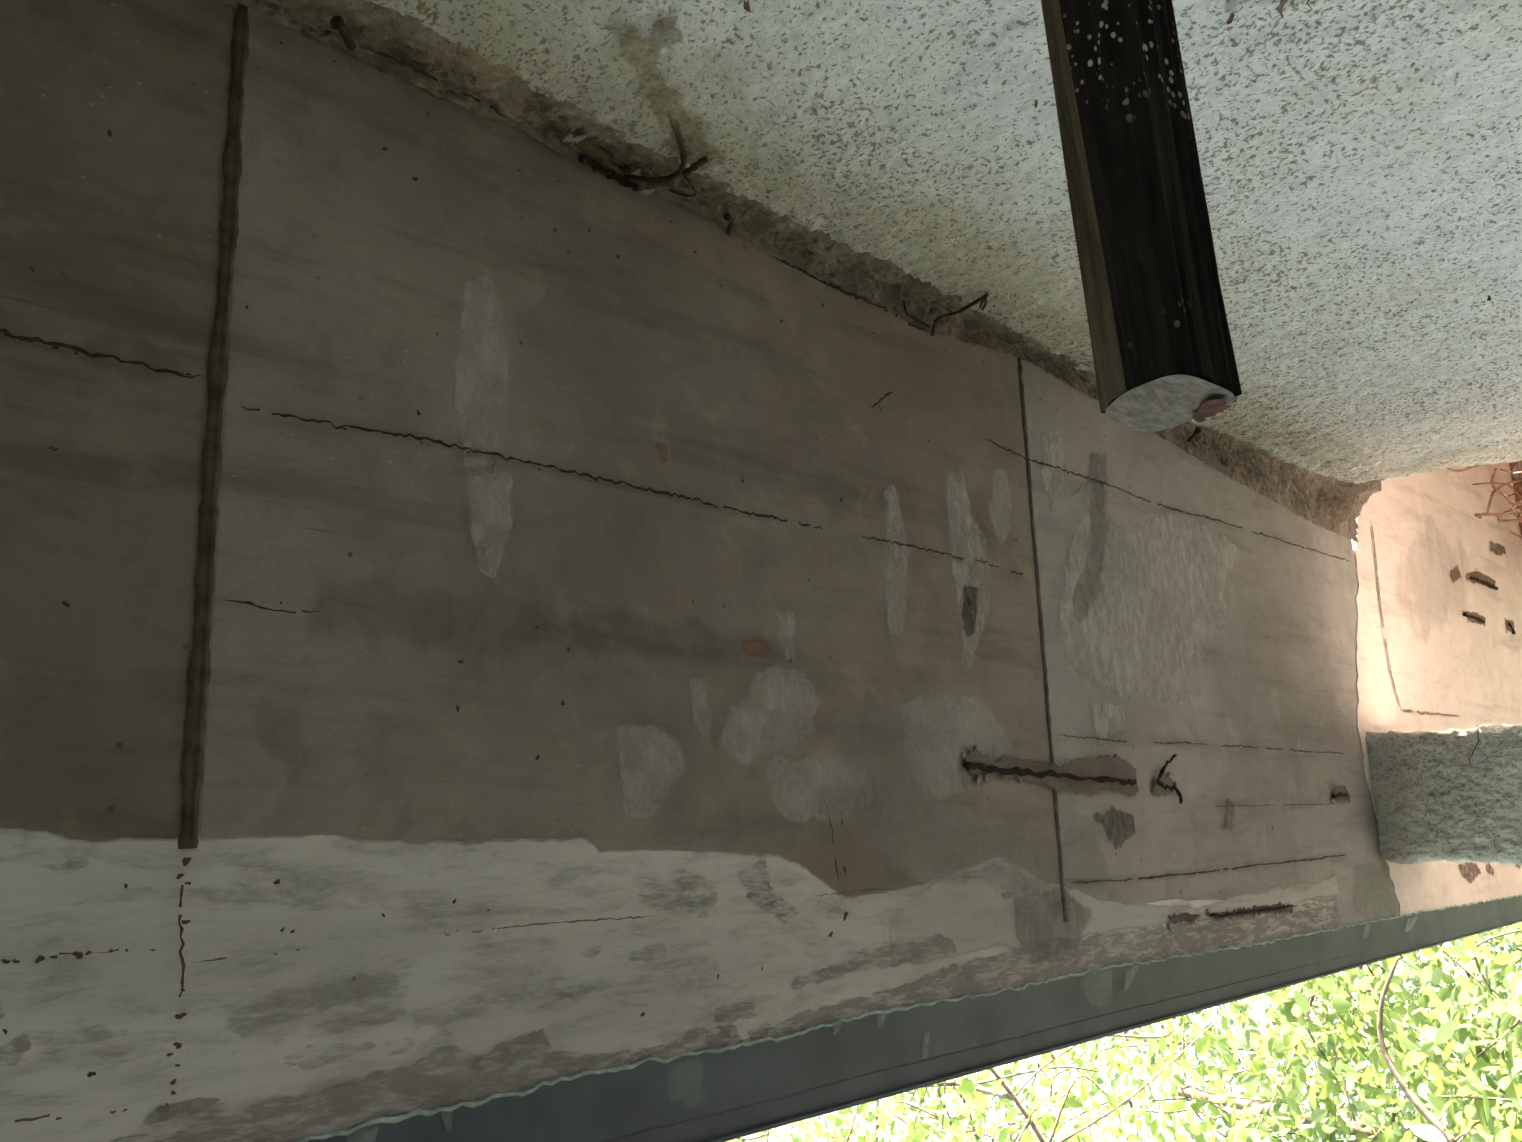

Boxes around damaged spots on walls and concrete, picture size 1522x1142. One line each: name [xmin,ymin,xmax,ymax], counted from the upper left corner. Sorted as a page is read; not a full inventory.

crack [0,329,204,379]
crack [241,406,822,529]
crack [861,535,1023,575]
crack [988,439,1480,765]
spalling [960,746,1183,804]
spalling [1330,785,1351,804]
crack [444,915,654,936]
crack [1,857,226,1108]
peeling [113,899,1341,1142]
crack [15,1114,62,1123]